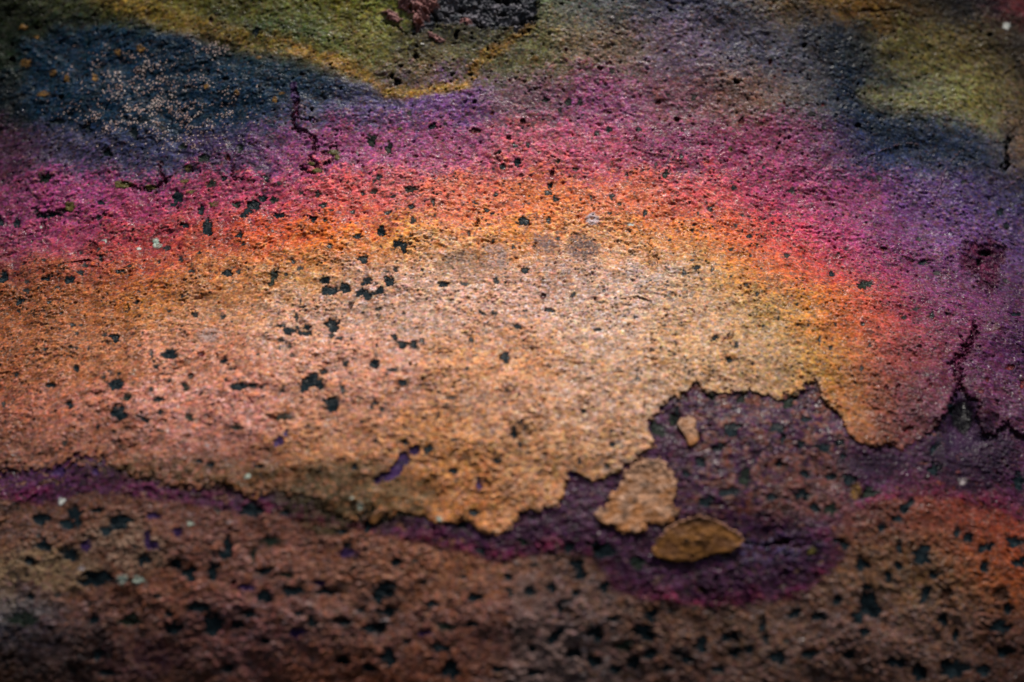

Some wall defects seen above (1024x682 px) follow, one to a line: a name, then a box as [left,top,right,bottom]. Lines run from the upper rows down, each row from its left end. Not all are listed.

peeling [335,163,393,223]
peeling [625,99,843,276]
peeling [158,245,215,317]
peeling [724,278,820,344]
crack [951,326,977,387]
peeling [360,398,493,492]
peeling [954,527,1024,573]